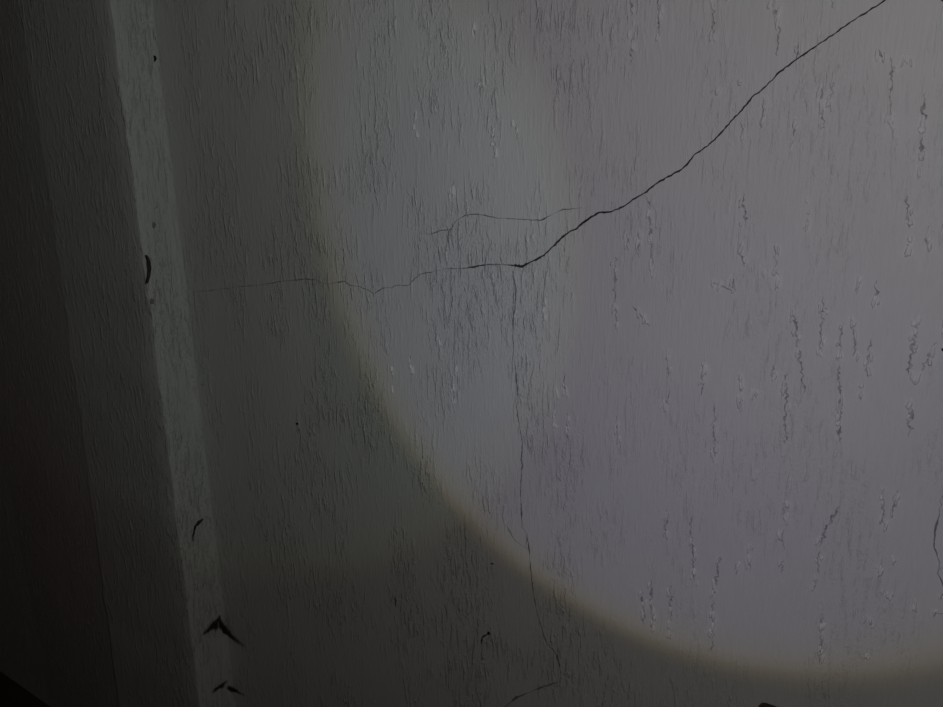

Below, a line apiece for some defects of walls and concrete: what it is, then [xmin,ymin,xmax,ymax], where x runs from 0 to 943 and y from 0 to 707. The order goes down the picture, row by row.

crack [207,0,886,707]
crack [933,496,943,585]